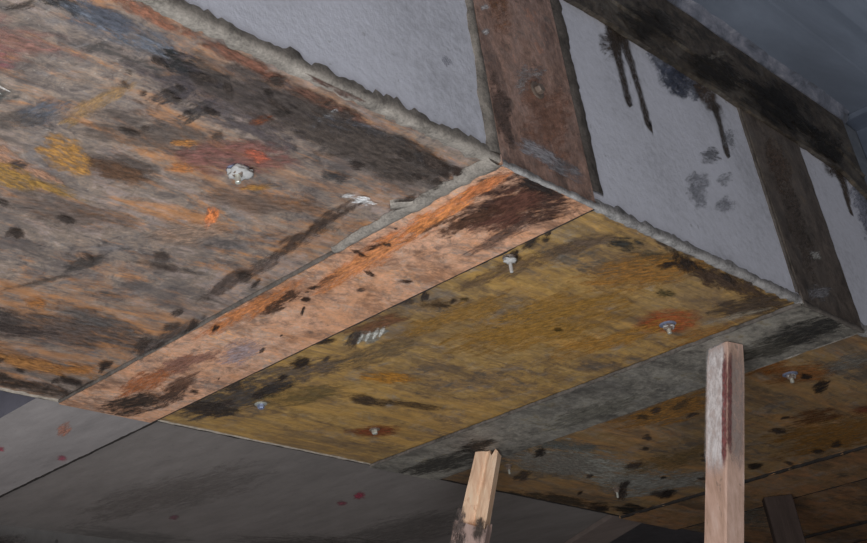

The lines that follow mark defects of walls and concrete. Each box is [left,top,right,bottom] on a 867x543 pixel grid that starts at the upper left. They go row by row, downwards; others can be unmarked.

water stain [309,75,363,101]
rust [640,310,695,332]